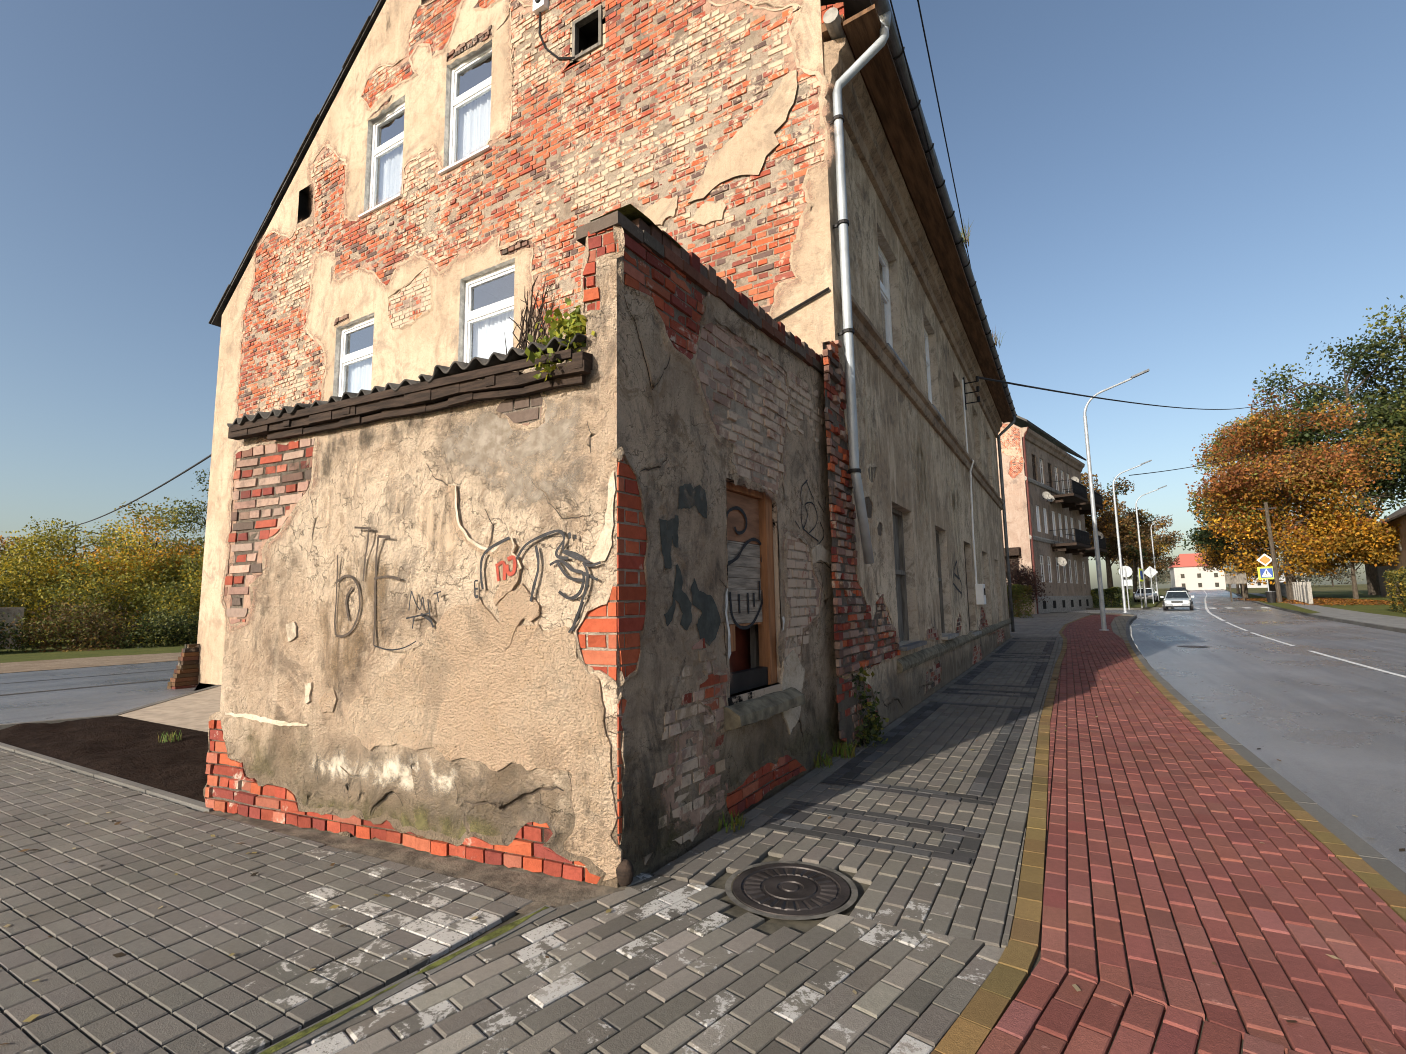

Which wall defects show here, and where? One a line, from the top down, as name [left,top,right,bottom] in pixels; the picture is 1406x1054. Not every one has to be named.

efflorescence [320,756,454,789]
spalling [203,0,901,886]